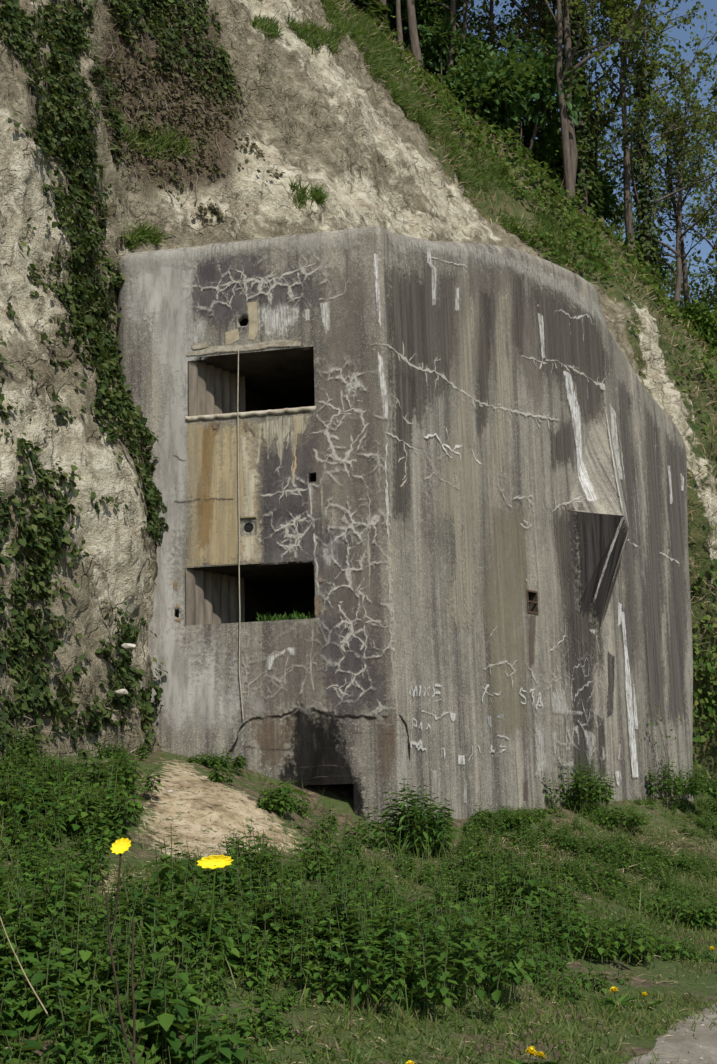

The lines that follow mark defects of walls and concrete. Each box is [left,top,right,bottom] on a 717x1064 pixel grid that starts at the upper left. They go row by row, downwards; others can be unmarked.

crack [191,256,349,309]
crack [371,342,560,427]
crack [521,347,606,390]
corrosion [292,415,302,483]
crack [175,496,233,504]
corrosion [186,419,259,570]
water stain [118,229,689,819]
crack [498,484,582,528]
crack [227,367,481,779]
crack [484,628,597,750]